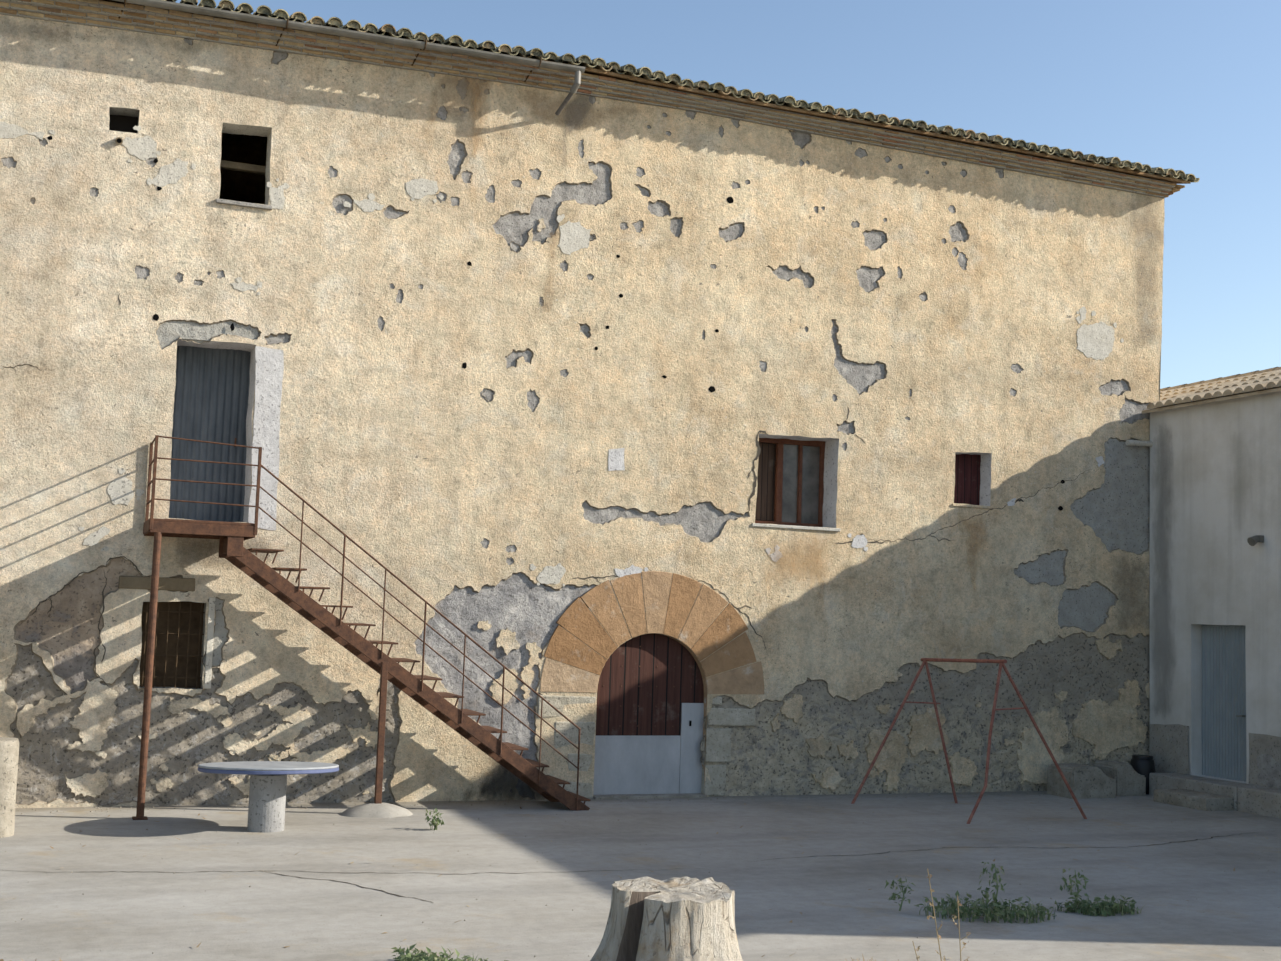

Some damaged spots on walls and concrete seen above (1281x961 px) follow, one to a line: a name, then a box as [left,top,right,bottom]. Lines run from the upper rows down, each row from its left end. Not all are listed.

spalling [447,140,472,183]
spalling [492,140,611,253]
spalling [153,314,290,349]
spalling [831,320,885,394]
spalling [1098,380,1151,423]
spalling [582,502,748,542]
crack [748,430,768,511]
crack [835,469,1090,545]
spalling [1058,438,1150,554]
spalling [6,558,566,838]
spalling [414,545,595,761]
spalling [589,550,1150,830]